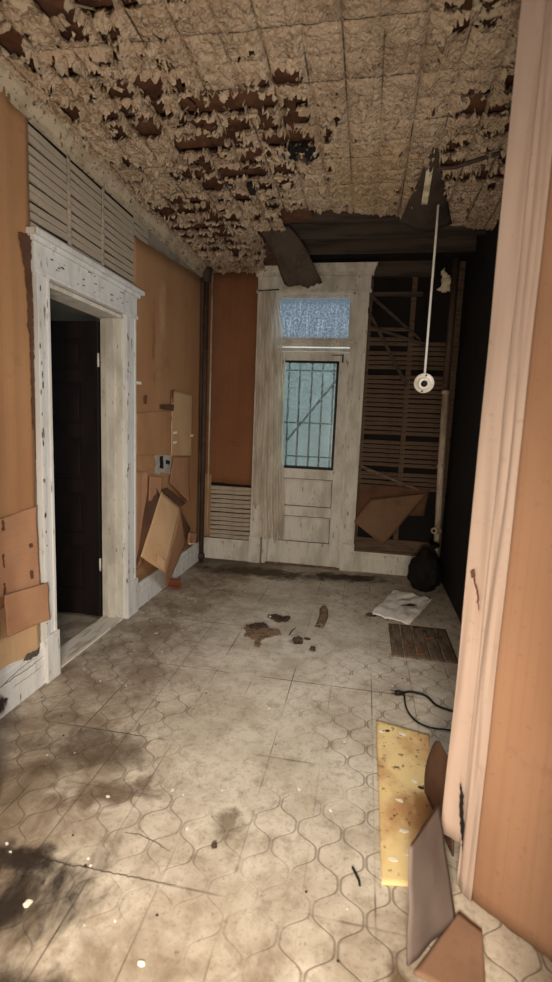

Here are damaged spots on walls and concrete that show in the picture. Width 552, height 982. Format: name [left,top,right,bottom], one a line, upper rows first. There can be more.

peeling [426,0,511,73]
peeling [0,0,330,283]
peeling [441,63,515,201]